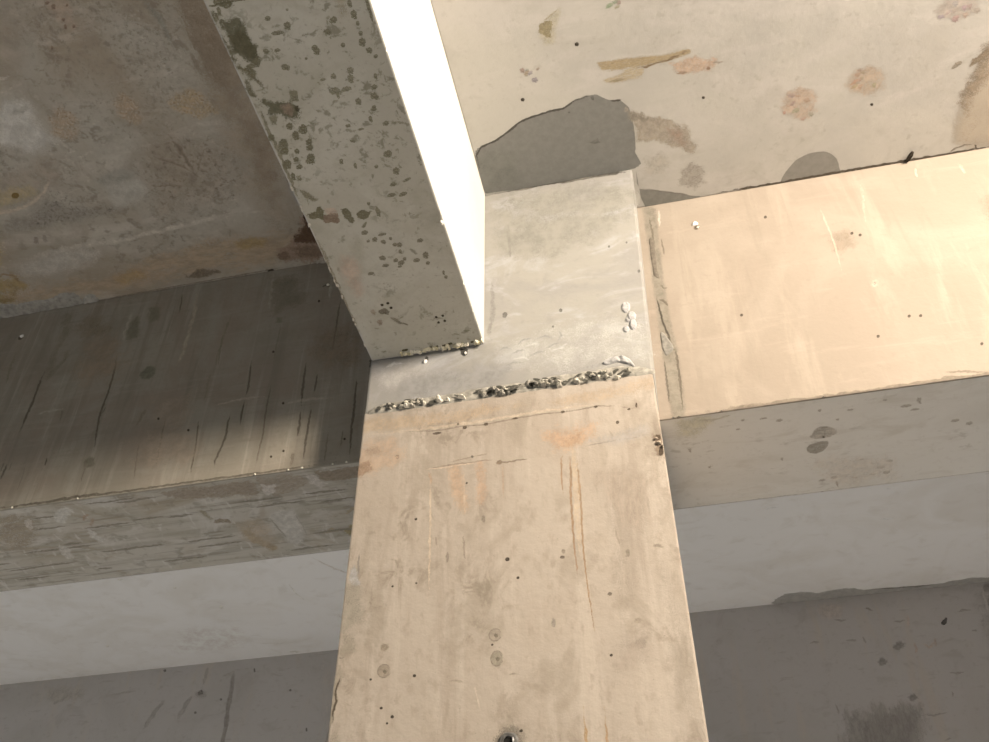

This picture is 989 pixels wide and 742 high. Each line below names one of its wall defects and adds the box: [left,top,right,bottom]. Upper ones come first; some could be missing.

damp [950,41,989,149]
flaking render [475,94,700,207]
crack [21,372,45,428]
crack [94,360,116,447]
crack [190,361,271,474]
crack [297,363,318,459]
crack [221,666,235,742]